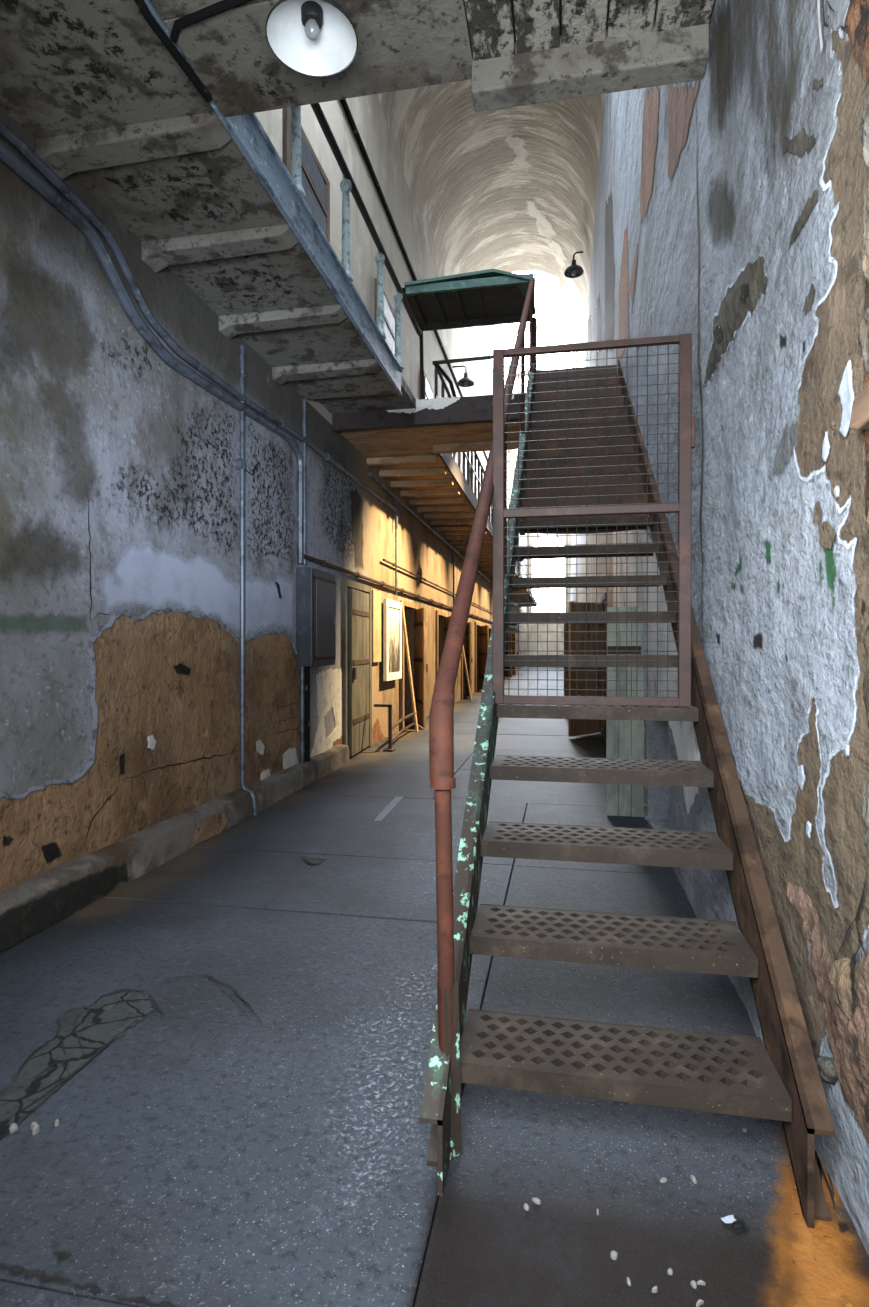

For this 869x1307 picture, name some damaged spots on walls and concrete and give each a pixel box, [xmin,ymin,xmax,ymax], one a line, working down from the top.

flaking render [618,80,699,360]
water stain [4,530,79,574]
water stain [0,262,160,500]
water stain [117,409,294,564]
peeling [738,0,869,1143]
spalling [0,607,343,892]